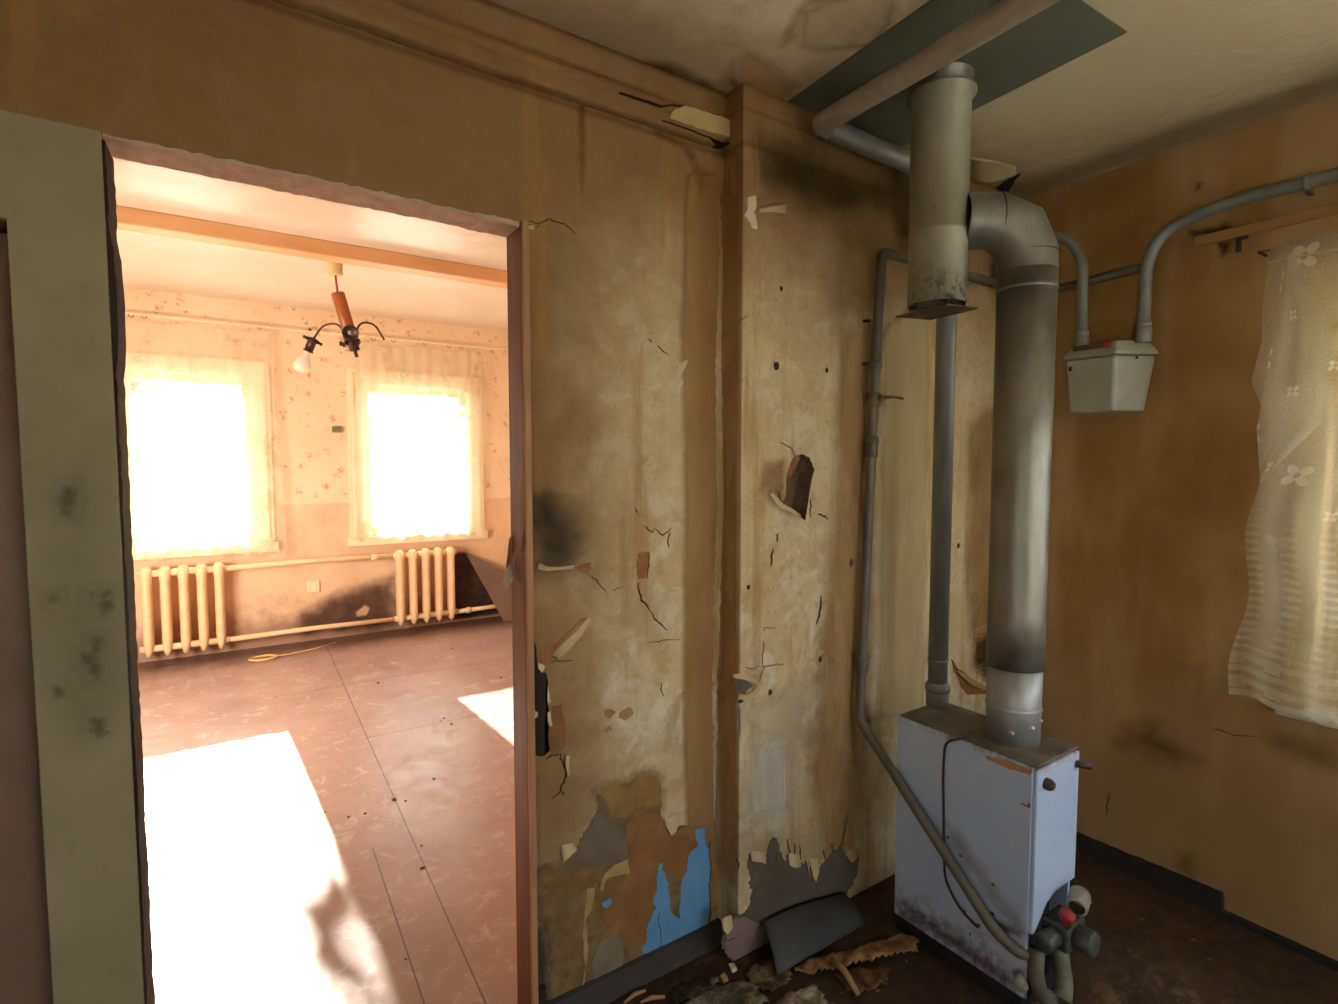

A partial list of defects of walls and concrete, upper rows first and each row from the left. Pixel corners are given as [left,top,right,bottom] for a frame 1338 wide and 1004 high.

leakage [804,0,890,48]
spalling [764,442,829,520]
leakage [302,585,391,633]
leakage [454,552,499,619]
crack [541,508,680,643]
spalling [534,643,567,756]
peeling [537,772,860,1003]